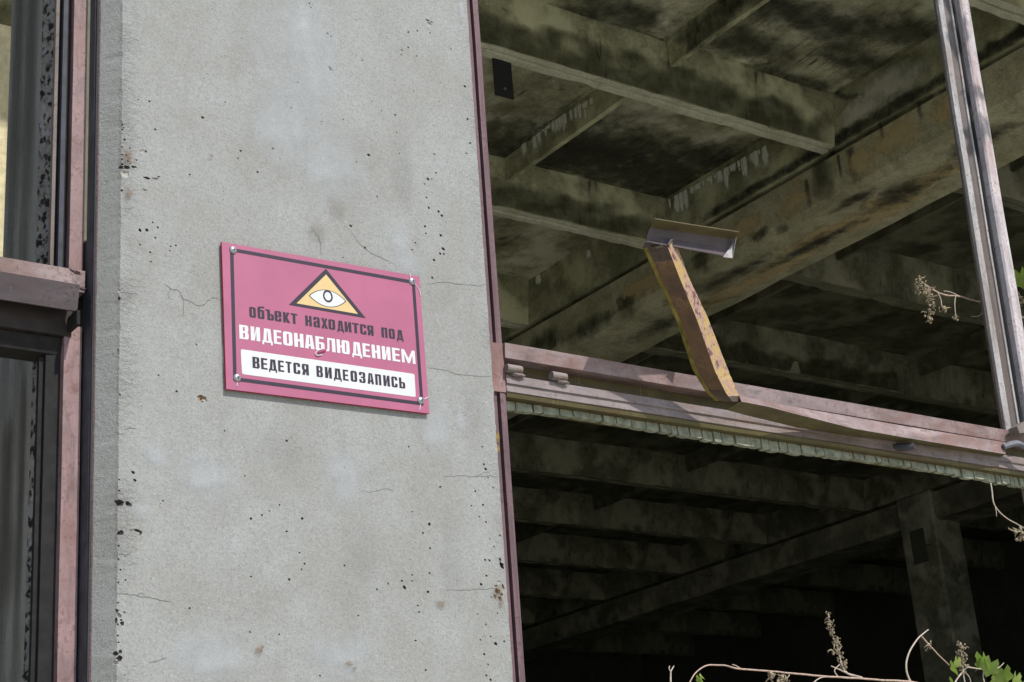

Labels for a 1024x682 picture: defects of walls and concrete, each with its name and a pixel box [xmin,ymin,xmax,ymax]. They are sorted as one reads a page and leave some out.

leakage [564,1,660,35]
leakage [686,0,828,91]
leakage [750,0,936,69]
leakage [977,24,1024,62]
leakage [479,14,827,217]
leakage [835,74,946,172]
leakage [841,168,949,208]
leakage [784,222,857,262]
crack [164,283,218,318]
leakage [535,331,556,348]
leakage [654,317,687,352]
leakage [716,338,899,391]